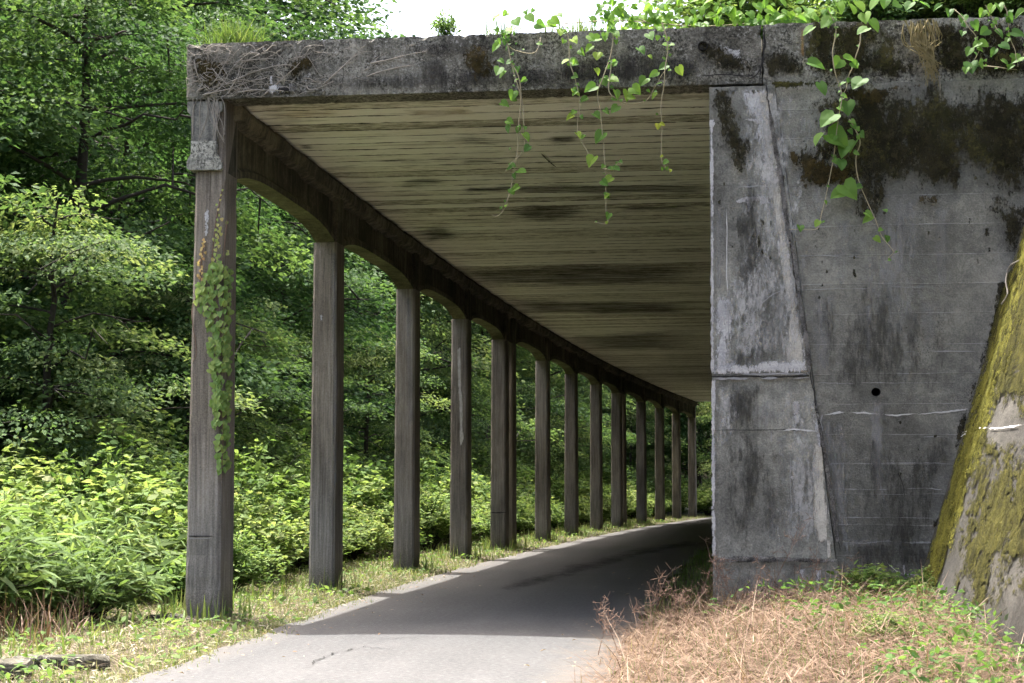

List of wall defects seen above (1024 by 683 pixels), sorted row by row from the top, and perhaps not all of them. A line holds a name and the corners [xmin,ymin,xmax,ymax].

crack [702,30,771,114]
water stain [713,89,805,535]
water stain [843,289,918,387]
water stain [786,397,831,558]
water stain [860,440,945,575]